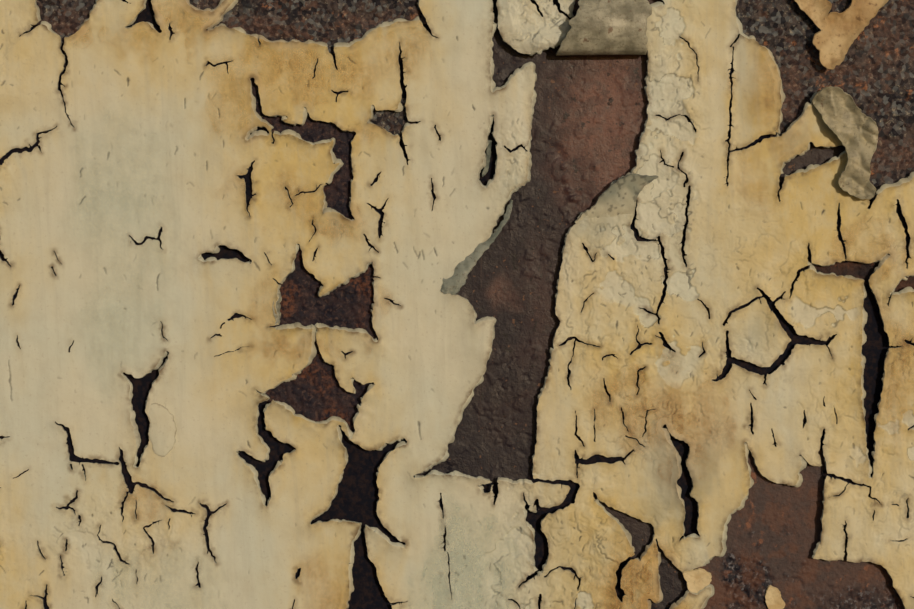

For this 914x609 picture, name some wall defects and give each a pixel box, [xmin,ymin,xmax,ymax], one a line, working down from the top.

crack [0,128,55,165]
crack [25,422,227,609]
peeling [176,0,437,70]
peeling [229,237,413,609]
peeling [239,42,421,228]
crack [364,172,389,253]
peeling [408,0,671,588]
crack [527,150,691,515]
peeling [589,418,912,609]
crack [697,287,837,447]
peeling [728,0,914,209]
crack [896,199,911,268]